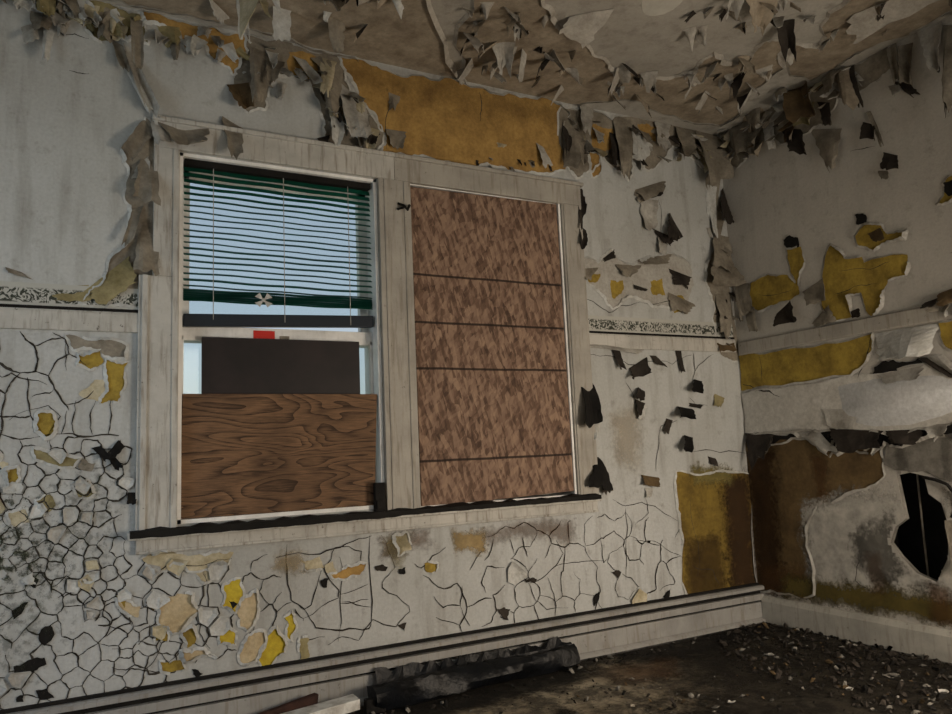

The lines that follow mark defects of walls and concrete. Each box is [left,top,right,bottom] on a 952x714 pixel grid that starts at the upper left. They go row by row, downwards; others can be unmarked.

peeling [13,0,952,188]
peeling [52,116,210,310]
flaking render [578,181,696,314]
spalling [30,409,125,500]
spalling [64,334,129,404]
crack [0,332,680,710]
peeling [581,383,603,440]
peeling [588,457,613,495]
peeling [590,344,725,434]
flaking render [674,174,952,604]
damp [783,574,952,626]
peeling [13,657,47,673]